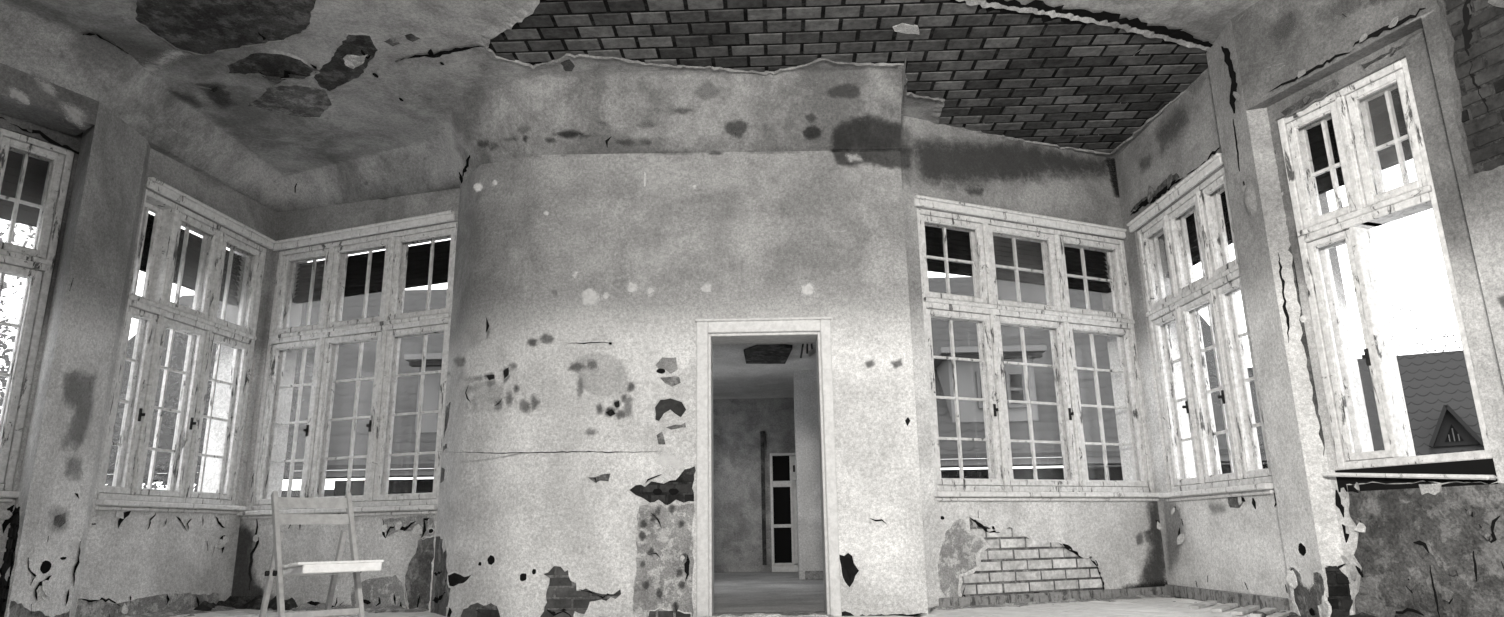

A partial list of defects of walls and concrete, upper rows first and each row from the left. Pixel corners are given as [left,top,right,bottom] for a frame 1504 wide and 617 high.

flaking render [131,0,421,118]
flaking render [480,0,1210,156]
crack [949,0,1425,171]
flaking render [1280,79,1341,117]
flaking render [1361,0,1504,180]
peeling [1278,190,1326,468]
flaking render [598,383,634,417]
flaking render [653,356,689,445]
flaking render [0,502,220,617]
flaking render [519,464,696,617]
flaking render [936,514,1106,598]
flaking render [1286,480,1504,617]